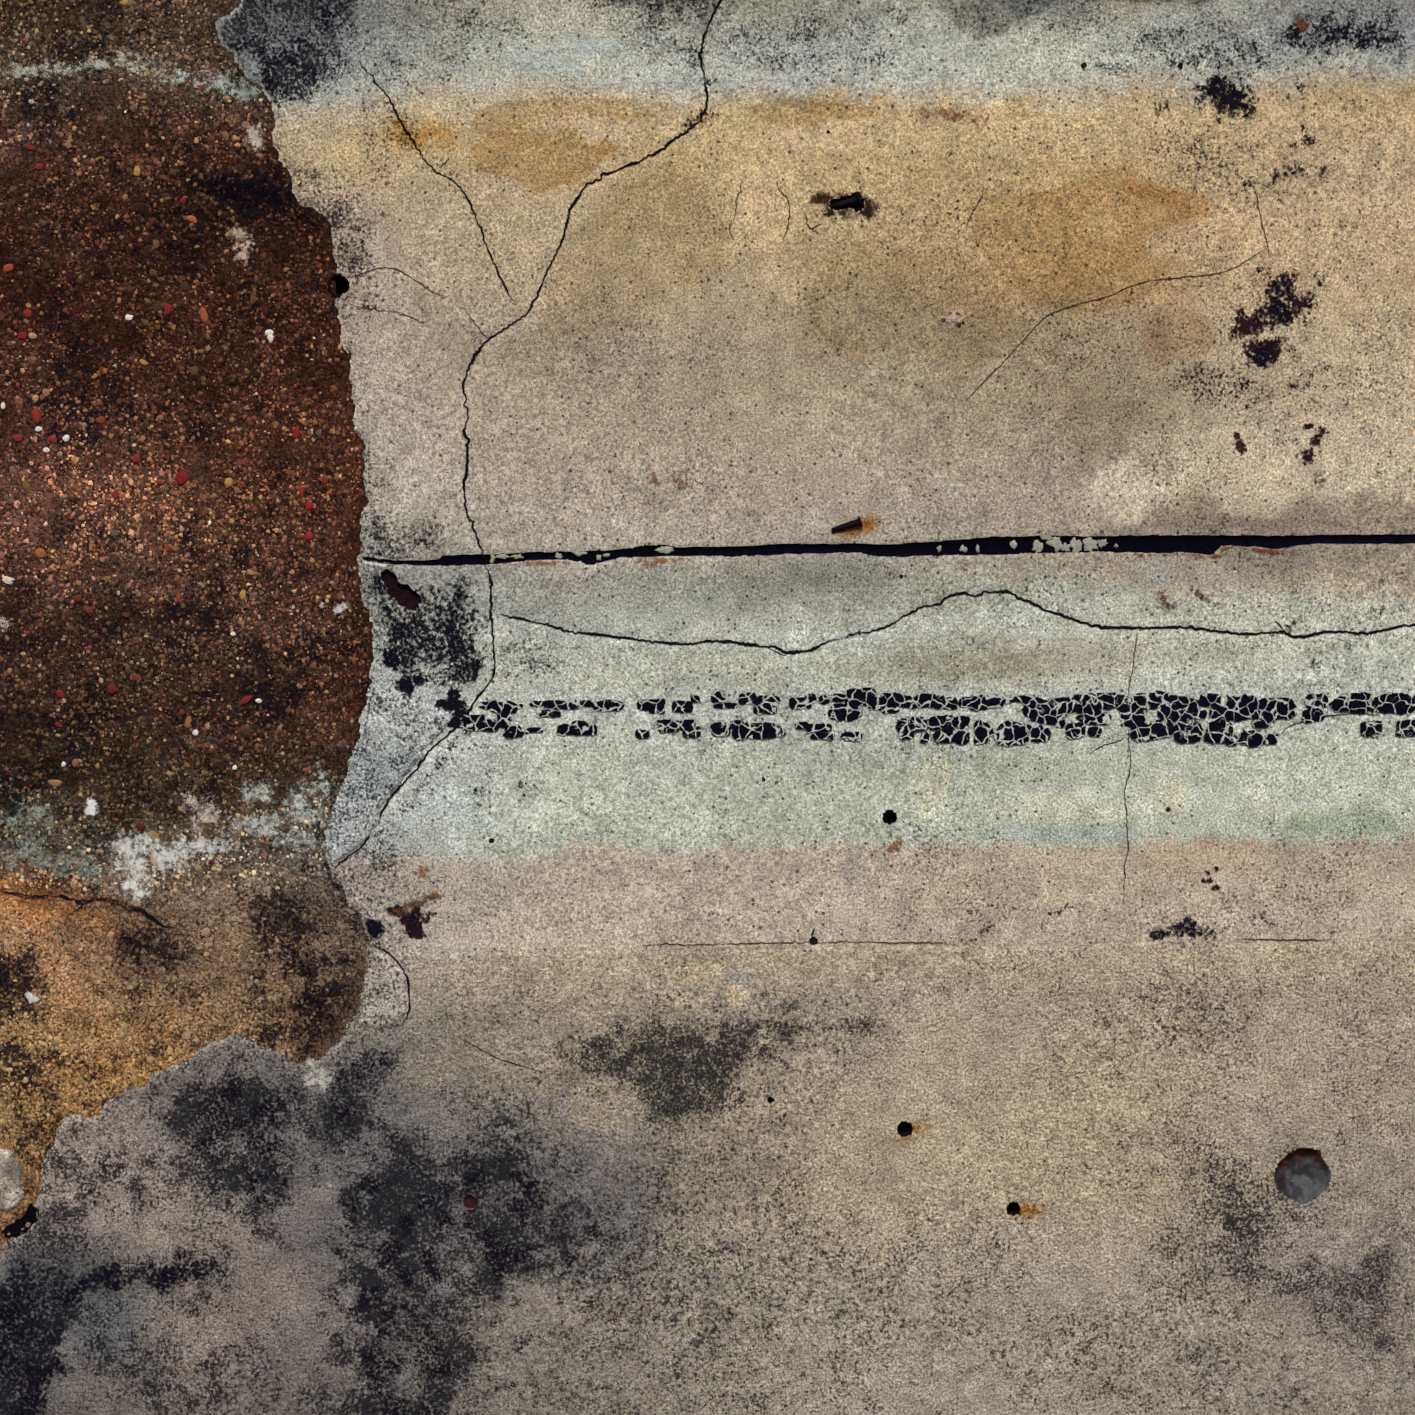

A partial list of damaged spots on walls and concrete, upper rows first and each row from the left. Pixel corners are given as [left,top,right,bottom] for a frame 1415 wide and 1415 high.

water stain [2,0,497,117]
water stain [1096,8,1406,123]
corrosion [810,189,878,219]
water stain [1167,253,1334,456]
crack [334,0,1415,898]
spalling [0,0,408,1254]
spalling [381,569,421,611]
water stain [362,506,494,815]
water stain [540,997,906,1131]
water stain [134,940,618,1415]
spalling [1274,1148,1331,1204]
water stain [0,1243,257,1415]